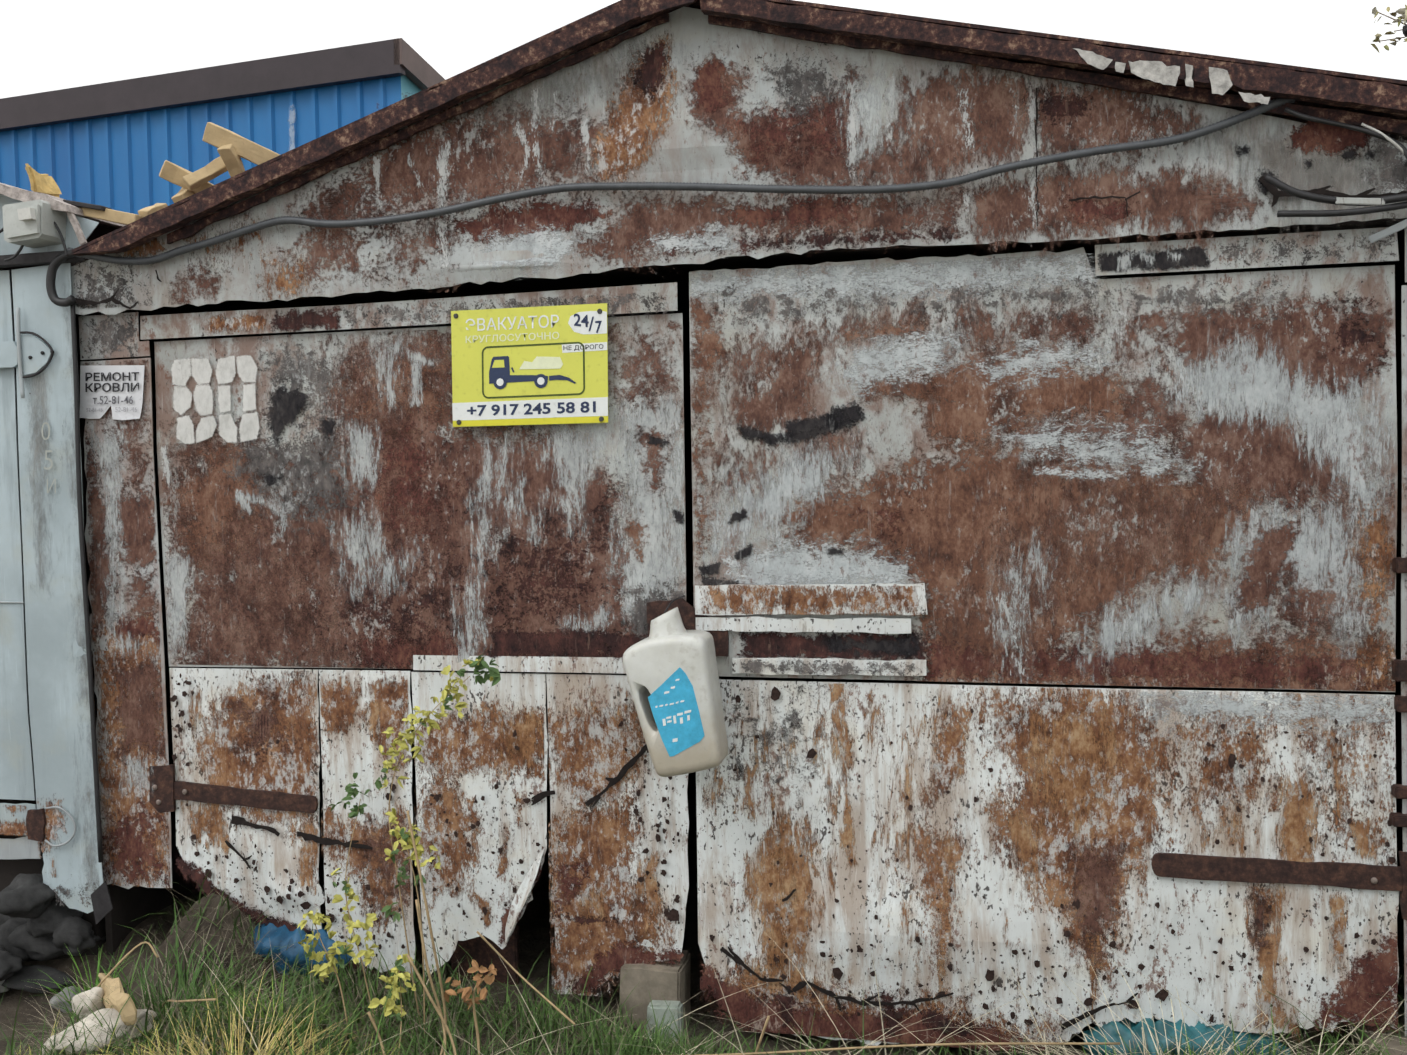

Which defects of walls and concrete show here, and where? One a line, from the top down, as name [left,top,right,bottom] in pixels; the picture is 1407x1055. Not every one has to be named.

peeling [1073,48,1270,104]
rust [1285,121,1375,157]
rust [85,31,1273,997]
rust [608,284,1407,1054]
spalling [429,783,507,854]
spalling [191,834,405,957]
spalling [429,859,524,925]